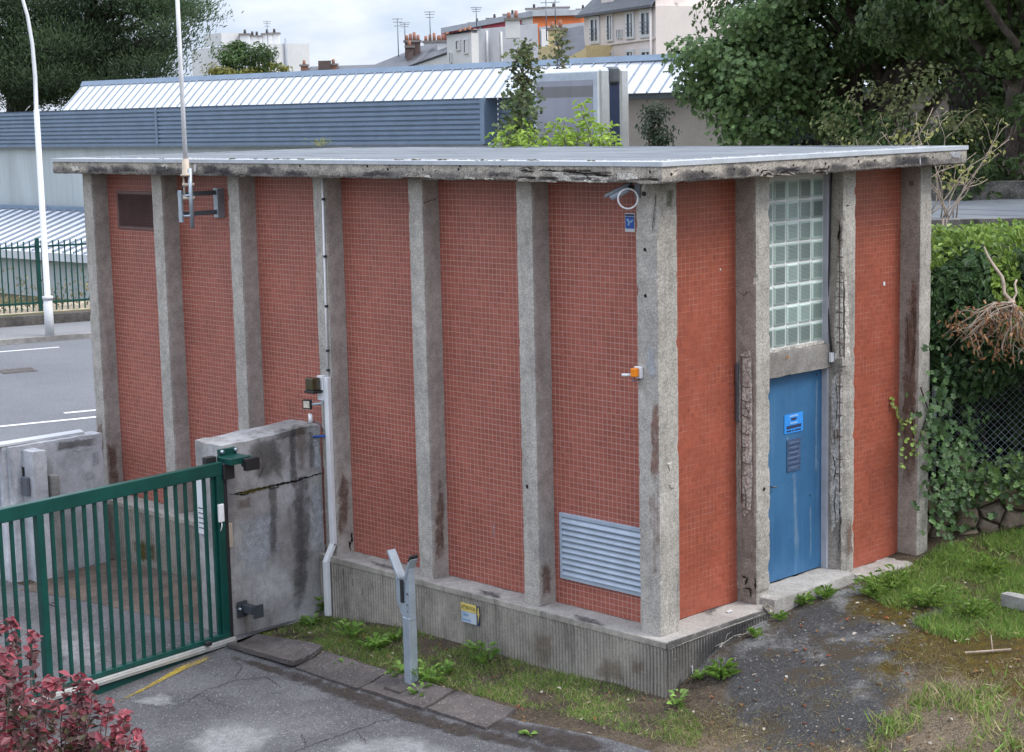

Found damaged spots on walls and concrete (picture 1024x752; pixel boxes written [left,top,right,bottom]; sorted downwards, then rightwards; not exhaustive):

spalling [464,167,661,184]
crack [230,473,322,496]
water stain [252,426,323,592]
spalling [738,350,753,516]
spalling [829,220,850,554]